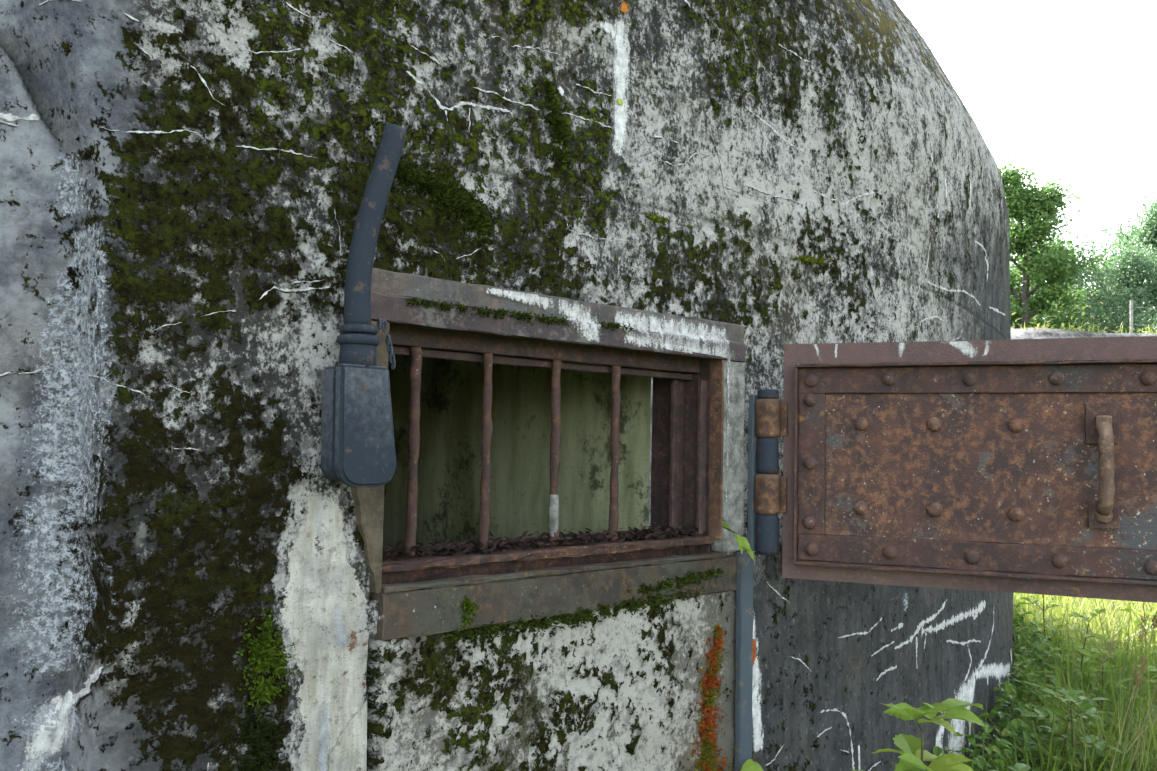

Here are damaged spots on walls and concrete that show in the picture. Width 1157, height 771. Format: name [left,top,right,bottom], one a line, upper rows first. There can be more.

crack [246,1,353,54]
crack [190,65,225,106]
crack [406,45,611,128]
leakage [590,20,630,155]
crack [102,127,201,136]
crack [237,145,315,158]
leakage [486,287,601,342]
leakage [615,311,731,434]
corrosion [382,524,708,560]
crack [838,599,994,715]
leakage [501,667,542,766]
crack [817,708,881,771]